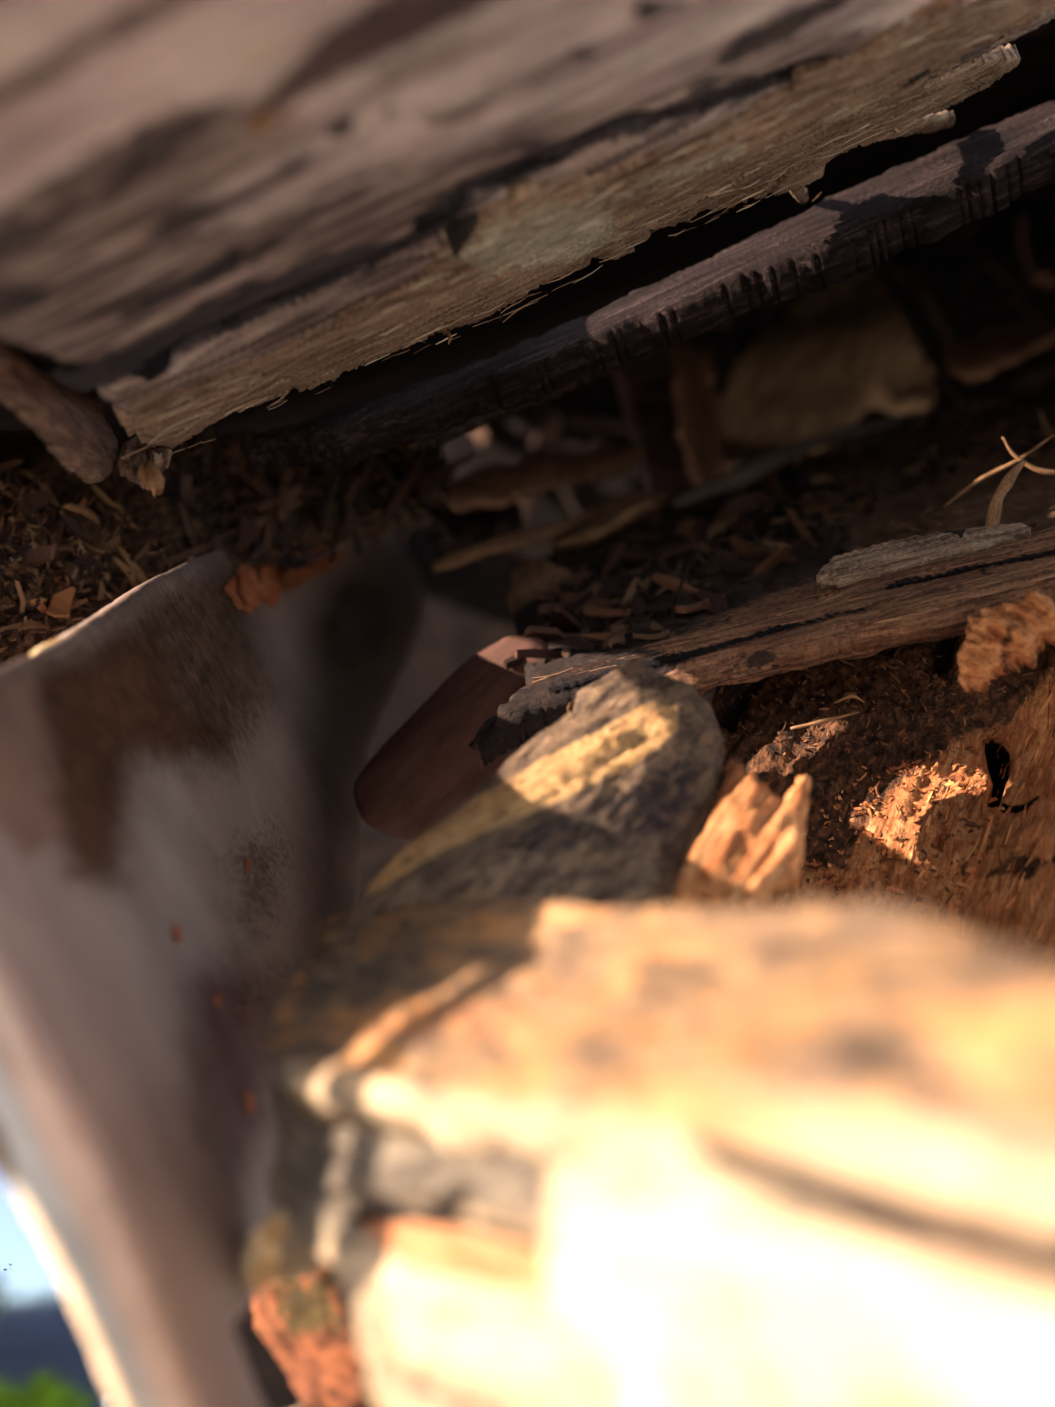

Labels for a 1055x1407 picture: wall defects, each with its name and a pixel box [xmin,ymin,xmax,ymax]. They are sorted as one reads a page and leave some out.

crack [988,740,1039,812]